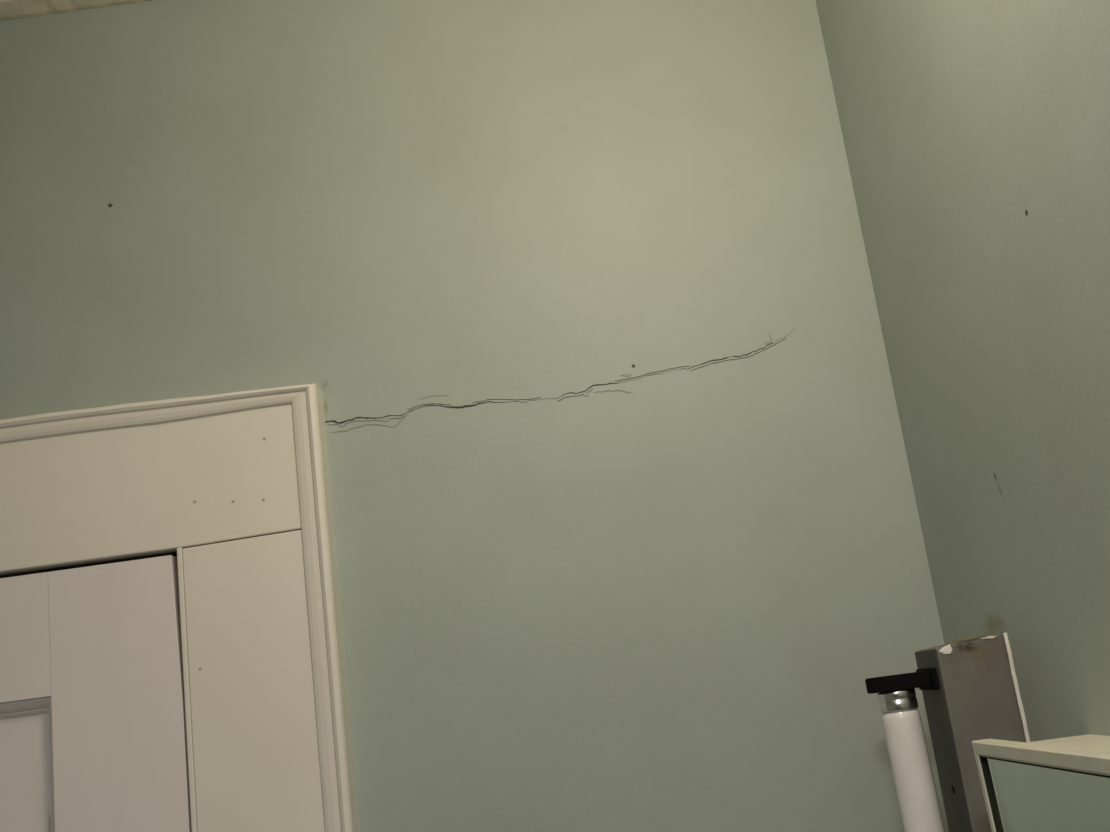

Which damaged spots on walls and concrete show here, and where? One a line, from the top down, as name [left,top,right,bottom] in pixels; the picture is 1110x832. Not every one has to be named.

crack [325,329,794,433]